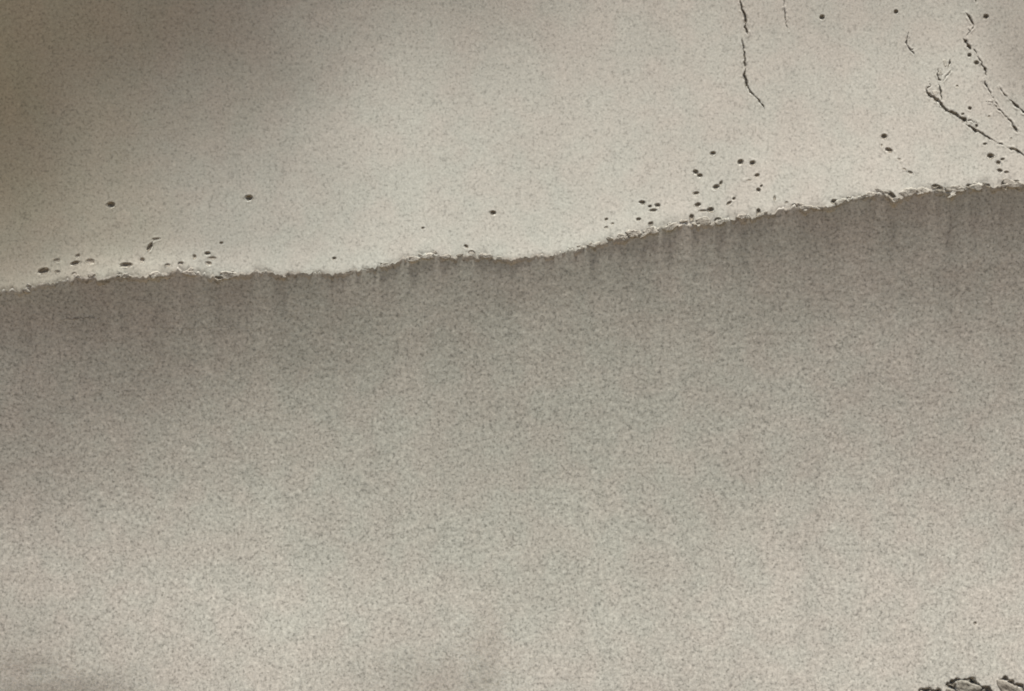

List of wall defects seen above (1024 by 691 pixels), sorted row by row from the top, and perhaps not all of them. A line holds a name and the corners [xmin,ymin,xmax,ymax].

crack [740,1,764,107]
crack [926,0,1024,155]
spalling [0,143,1024,297]
spalling [919,676,1024,691]